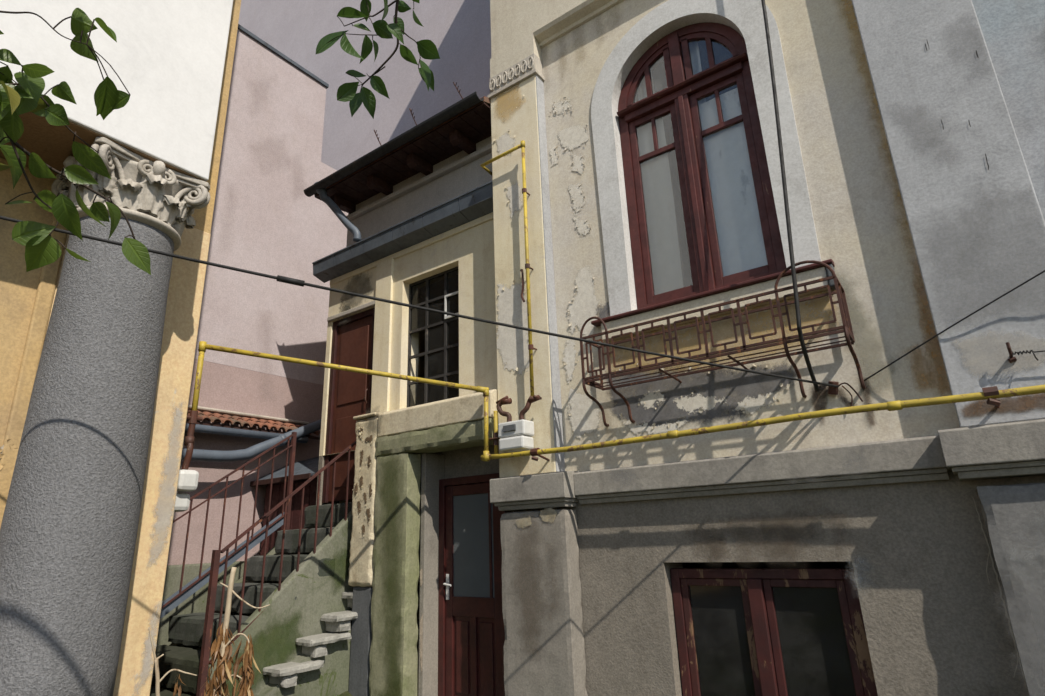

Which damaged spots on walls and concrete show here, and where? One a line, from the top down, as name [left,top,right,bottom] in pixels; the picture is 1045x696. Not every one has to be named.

peeling [493,86,525,156]
peeling [505,181,523,218]
peeling [549,124,591,236]
peeling [496,276,532,375]